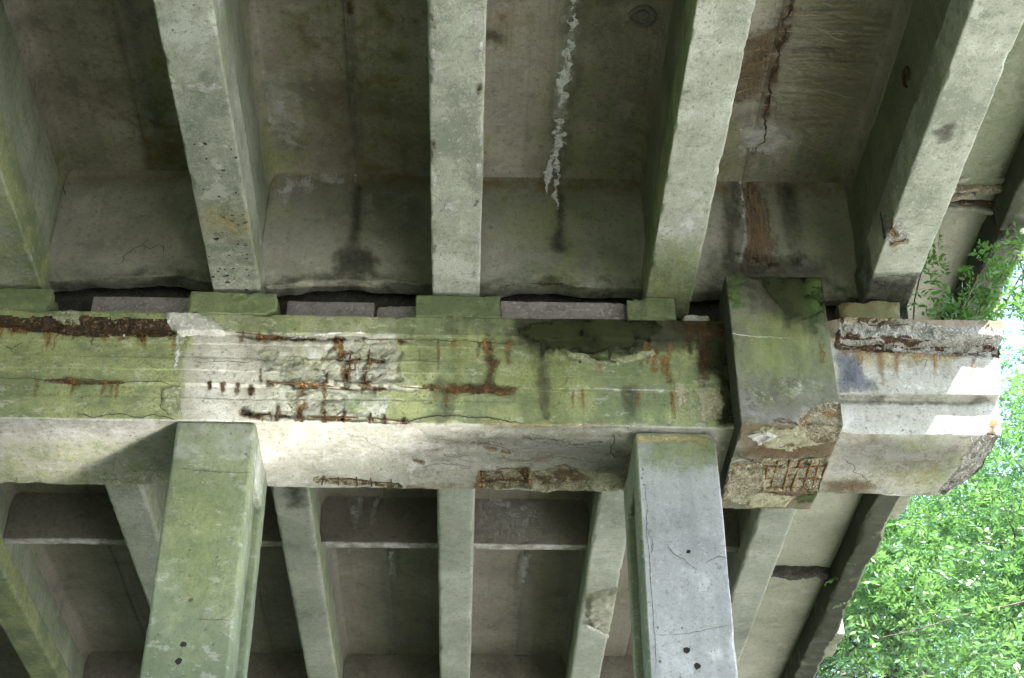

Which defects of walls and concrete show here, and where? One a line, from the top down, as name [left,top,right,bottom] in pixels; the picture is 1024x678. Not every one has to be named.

crack [753,0,795,153]
leakage [543,0,579,251]
rust [36,376,124,397]
spalling [0,310,433,425]
rust [422,336,518,401]
peeling [565,349,656,366]
rust [841,349,959,374]
spalling [834,317,1003,359]
spalling [475,460,626,493]
spalling [723,401,843,508]
spalling [880,435,998,496]